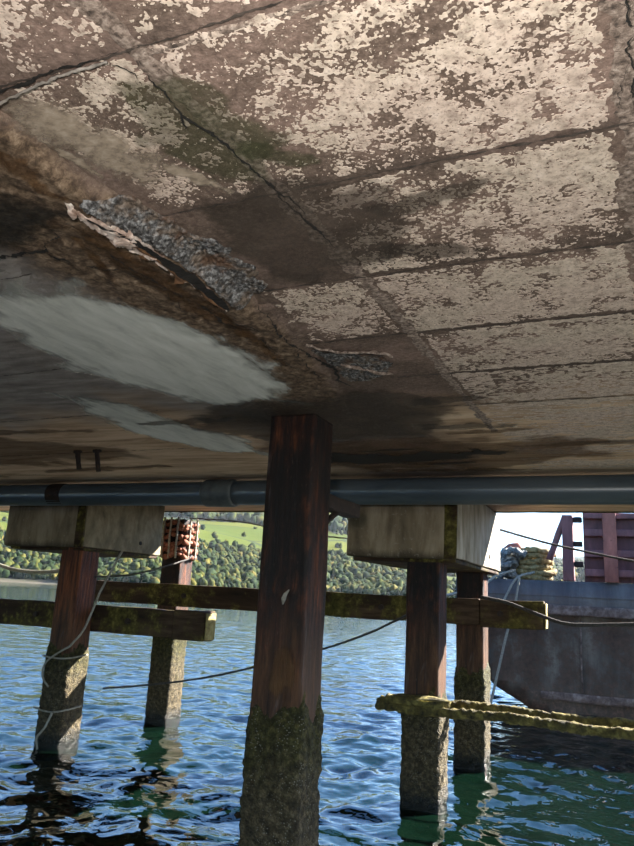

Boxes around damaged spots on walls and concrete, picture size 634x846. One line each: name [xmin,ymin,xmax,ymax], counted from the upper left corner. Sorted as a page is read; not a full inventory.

peeling [0,0,105,78]
peeling [121,0,258,39]
crack [617,0,634,110]
spalling [14,58,399,387]
peeling [149,0,634,469]
damp [139,391,515,442]